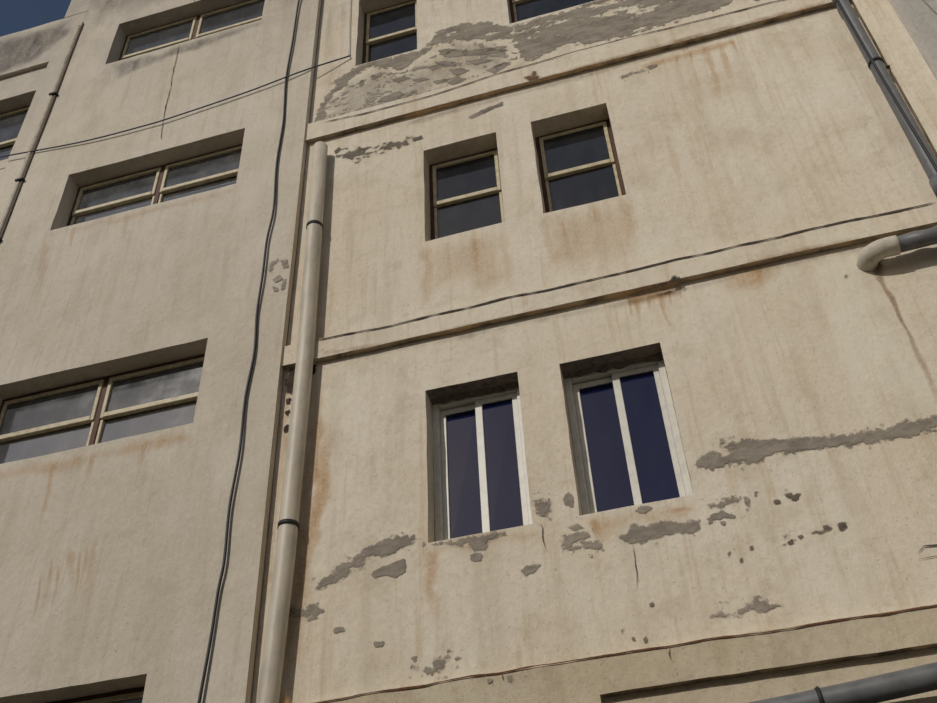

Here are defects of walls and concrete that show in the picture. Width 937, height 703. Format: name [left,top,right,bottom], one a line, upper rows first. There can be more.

peeling [314,0,732,122]
crack [161,47,179,136]
peeling [334,135,423,163]
crack [318,202,935,340]
peeling [695,415,937,471]
peeling [312,531,507,589]
peeling [521,564,541,576]
peeling [561,524,604,557]
peeling [619,491,758,544]
peeling [289,602,324,621]
peeling [709,595,781,618]
peeling [410,650,461,679]